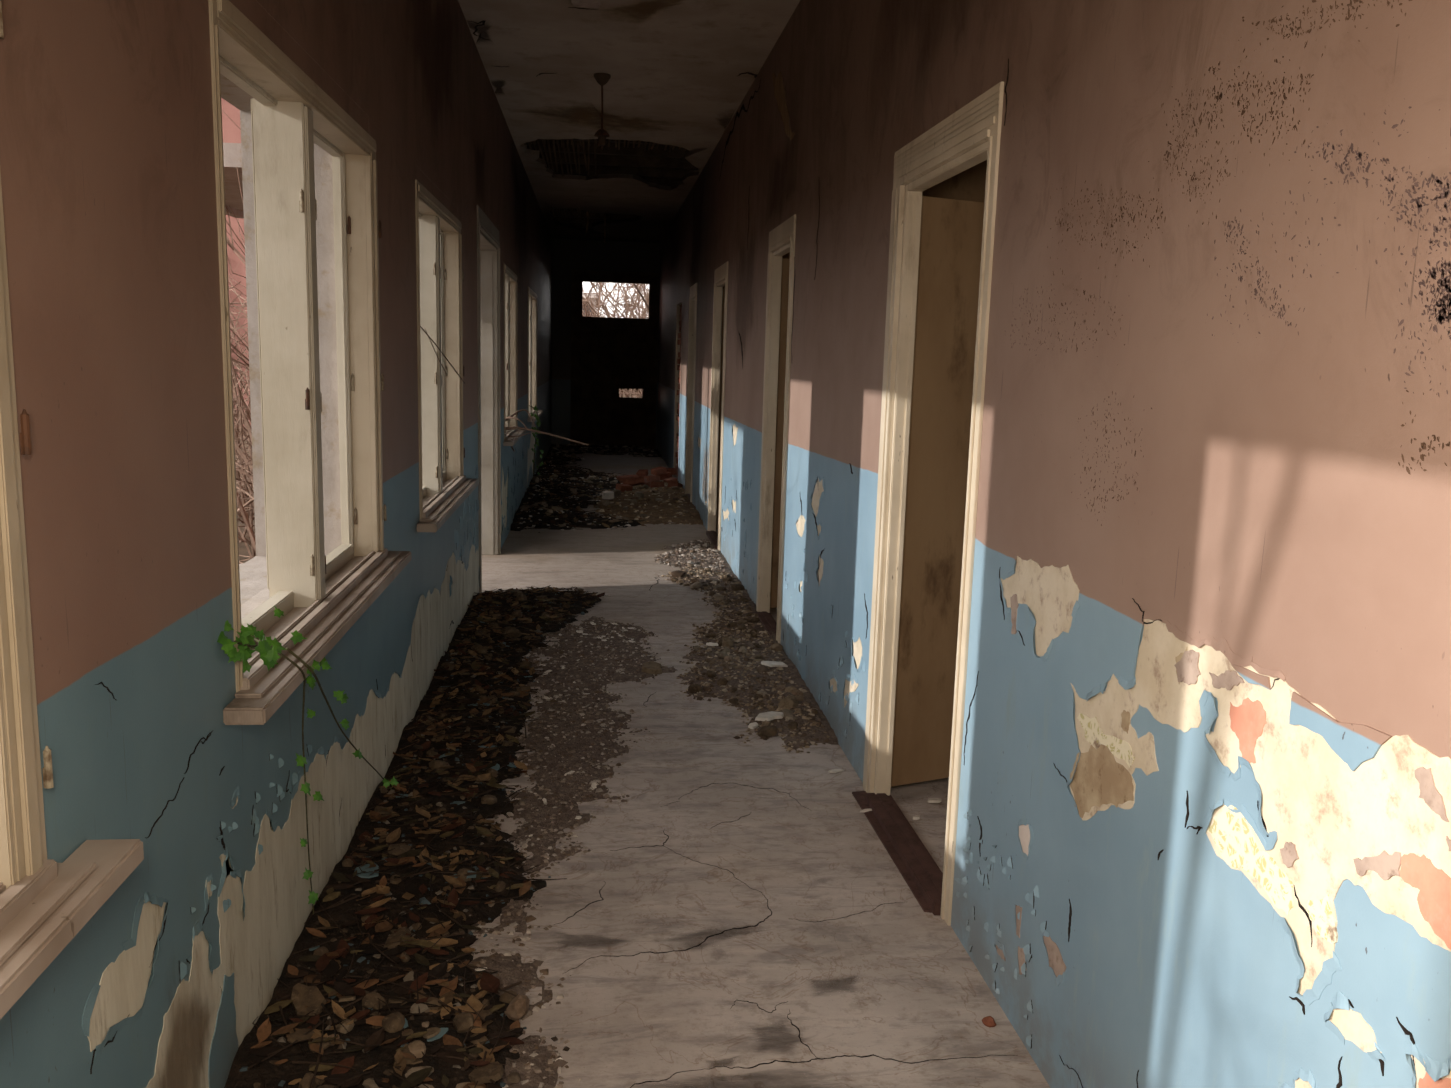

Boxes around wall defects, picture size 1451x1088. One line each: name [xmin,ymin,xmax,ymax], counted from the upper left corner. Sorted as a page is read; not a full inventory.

flaking render [516,138,713,191]
damp [1005,0,1451,474]
peeling [781,476,825,661]
peeling [818,631,866,737]
peeling [999,555,1080,662]
crack [145,731,213,838]
peeling [146,543,480,1088]
crack [554,783,902,973]
peeling [1053,598,1451,1076]
peeling [82,892,169,1074]
crack [630,1000,1006,1088]
peeling [1396,1017,1451,1088]